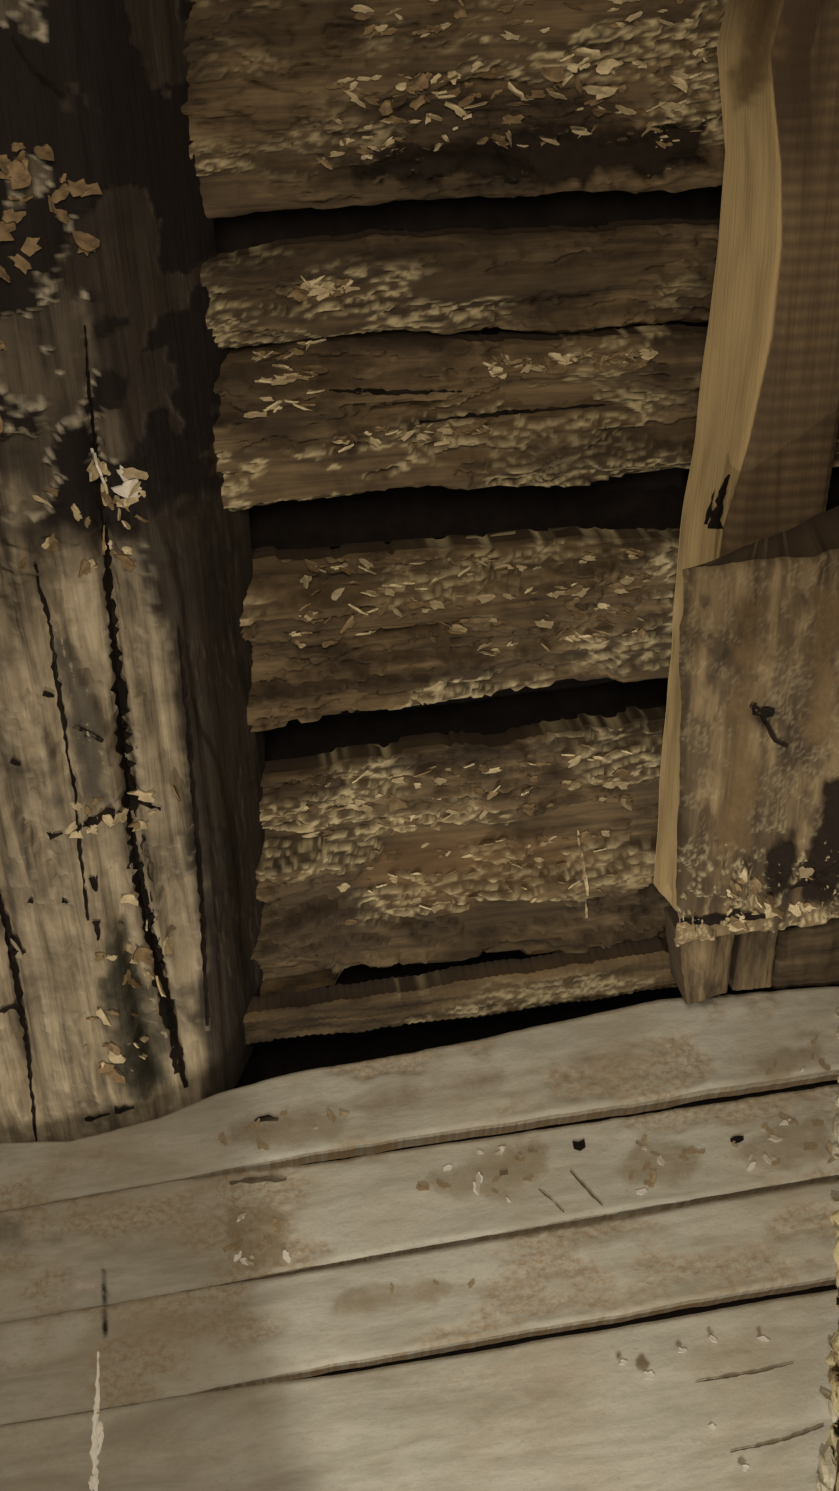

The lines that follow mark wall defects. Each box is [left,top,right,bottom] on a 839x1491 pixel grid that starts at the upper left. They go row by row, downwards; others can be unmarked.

crack [0,325,209,1142]
leakage [765,779,839,905]